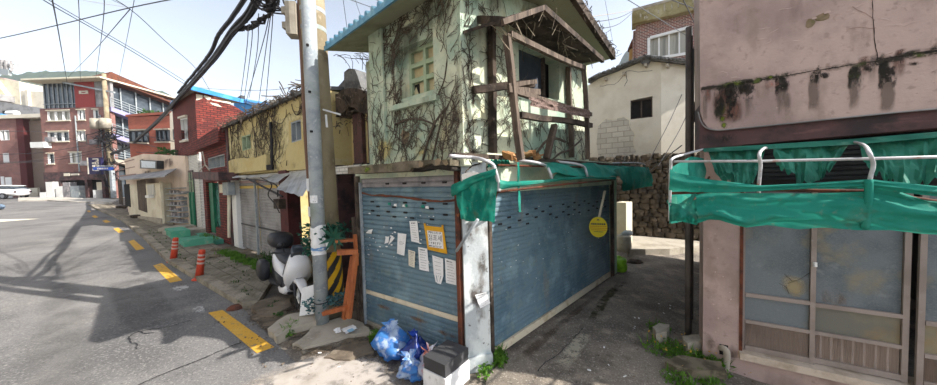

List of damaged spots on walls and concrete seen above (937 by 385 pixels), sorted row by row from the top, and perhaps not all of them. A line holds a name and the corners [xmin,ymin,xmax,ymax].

crack [701,0,937,91]
leakage [703,80,755,141]
leakage [769,74,790,106]
leakage [809,66,828,107]
leakage [848,50,917,109]